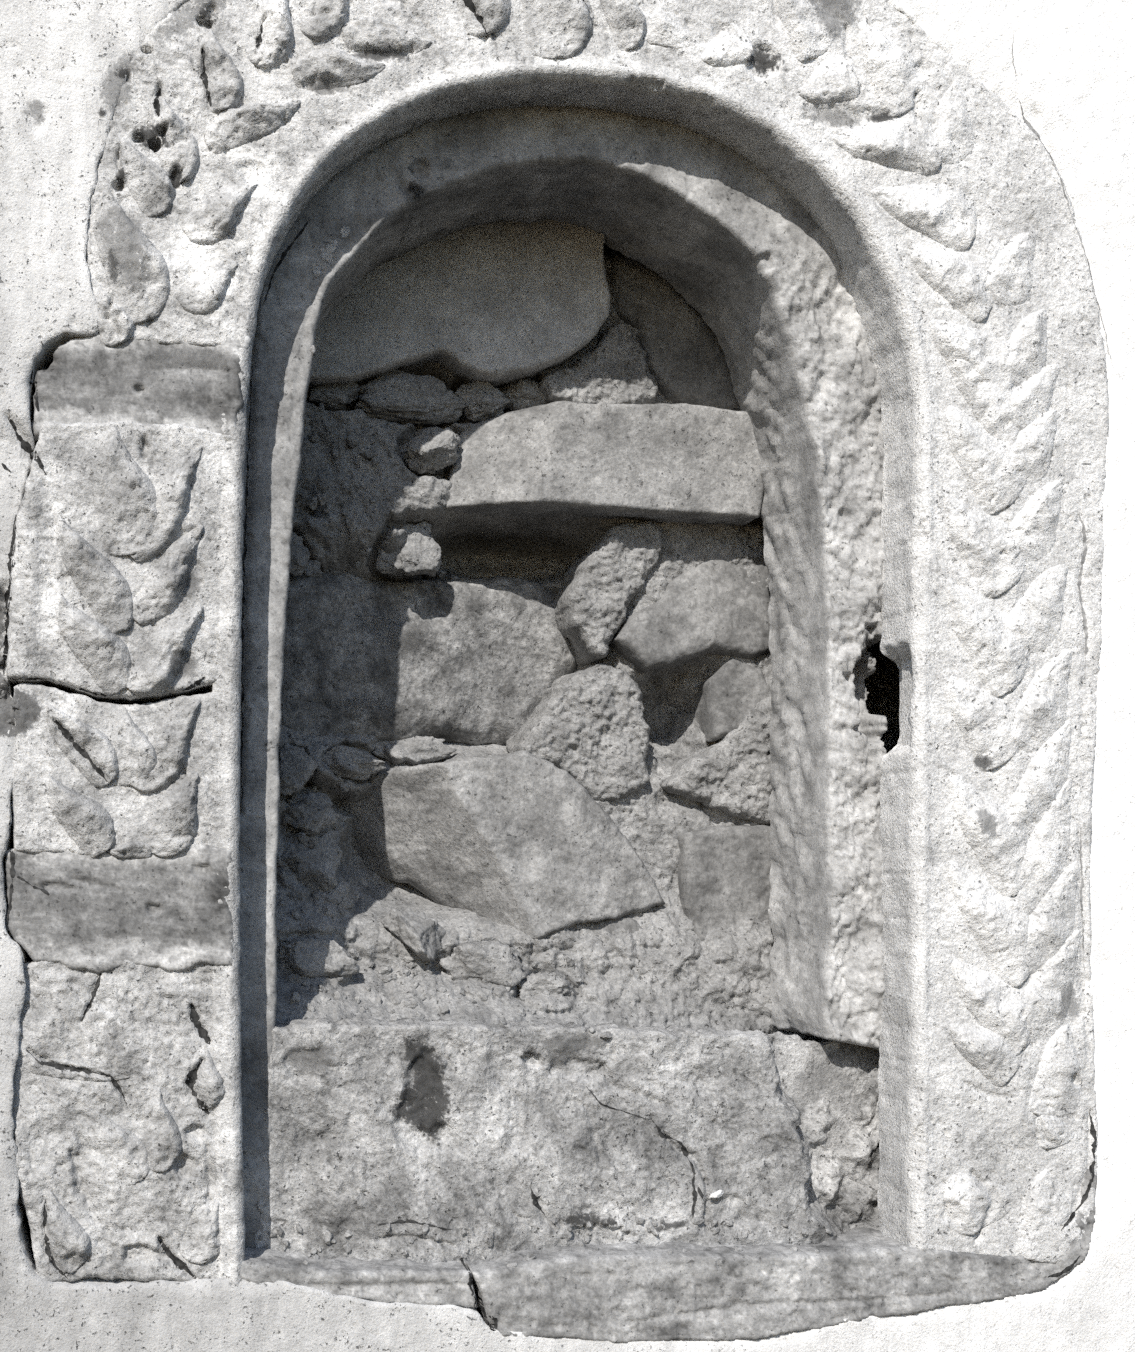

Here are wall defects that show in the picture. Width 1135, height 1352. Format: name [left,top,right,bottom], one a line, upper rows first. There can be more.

spalling [0,588,41,737]
crack [2,515,106,702]
crack [183,677,205,696]
crack [379,1220,497,1331]